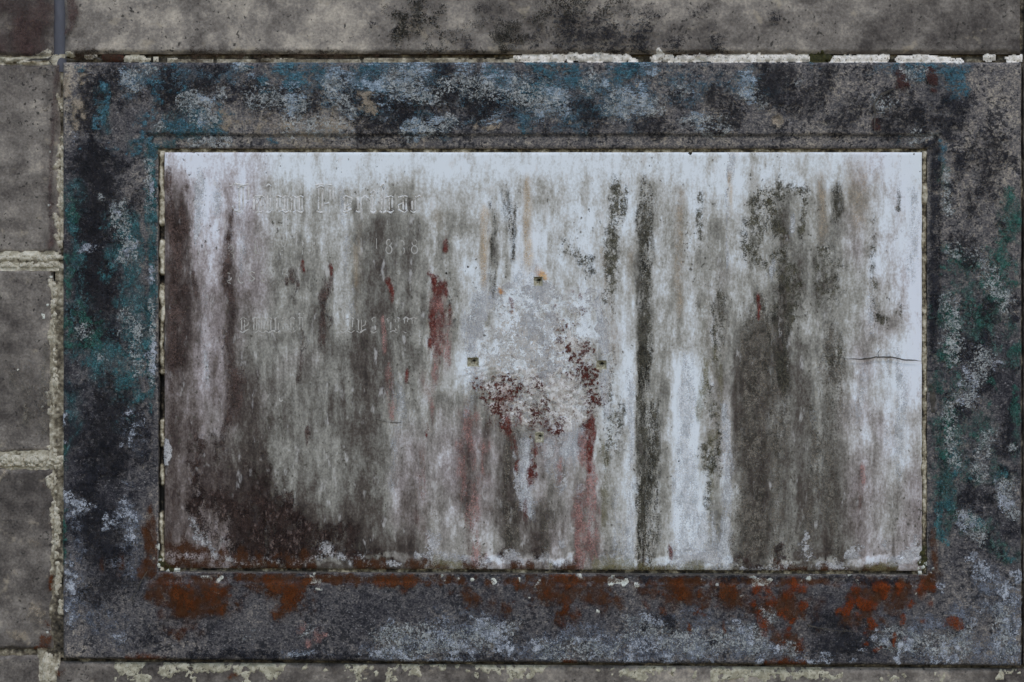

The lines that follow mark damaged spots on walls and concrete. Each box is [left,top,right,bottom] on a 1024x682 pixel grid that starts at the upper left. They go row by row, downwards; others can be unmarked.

damp [0,366,154,650]
damp [185,188,402,568]
damp [0,0,1023,448]
corrosion [137,291,941,665]
damp [186,396,1022,666]
damp [414,177,922,587]
crack [823,349,918,361]